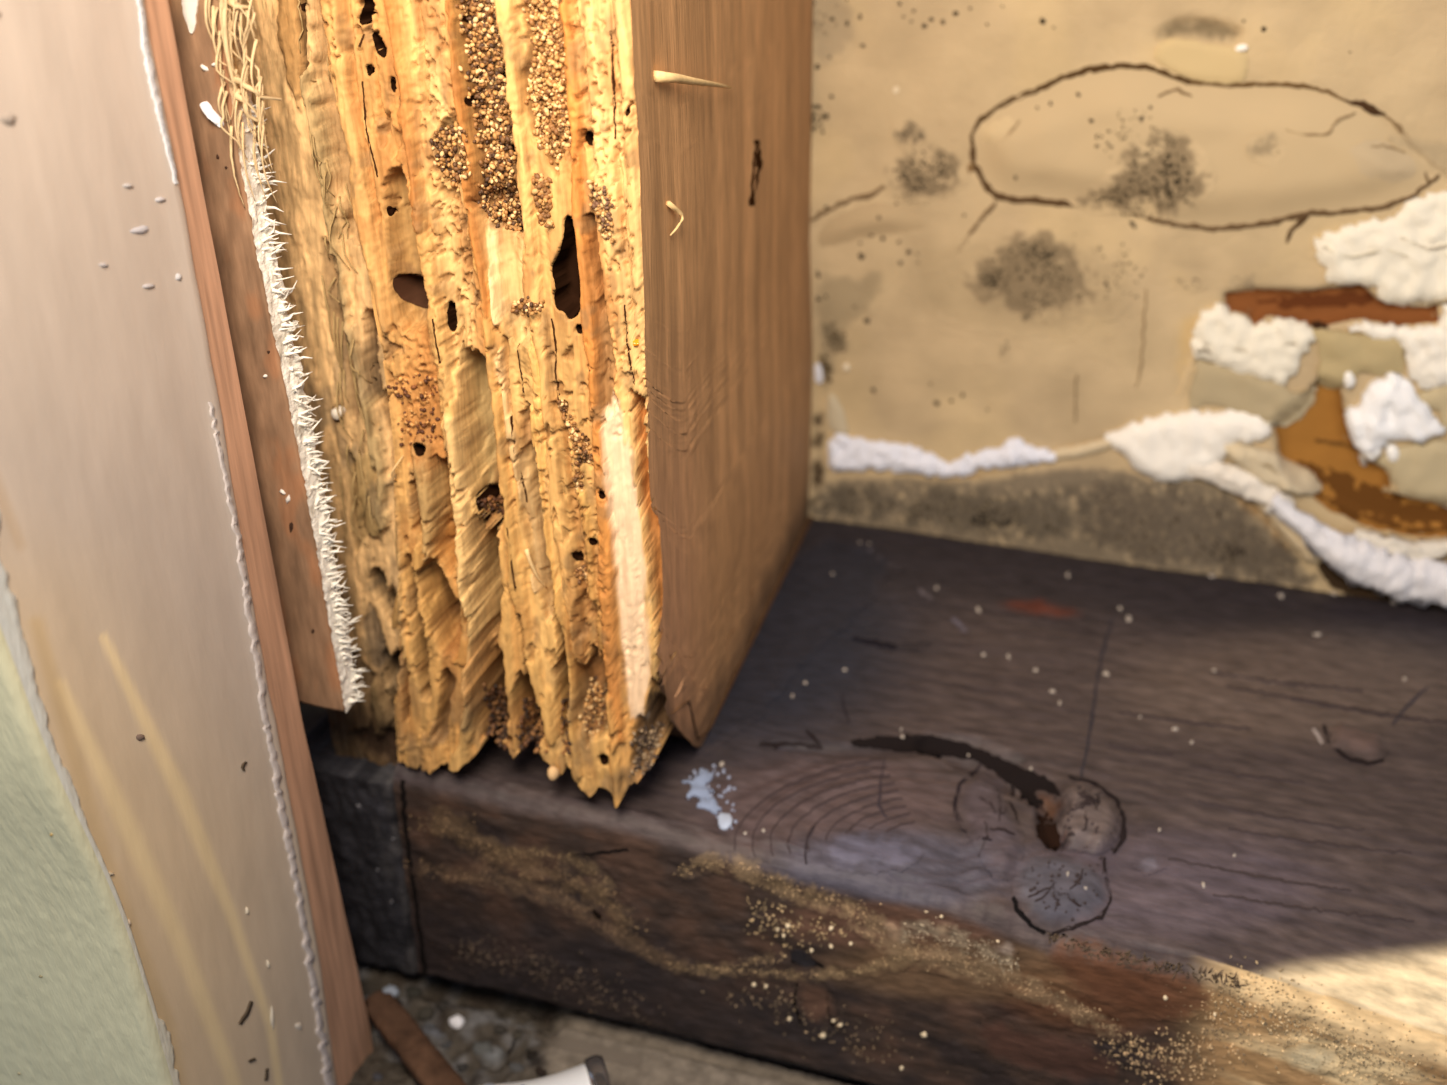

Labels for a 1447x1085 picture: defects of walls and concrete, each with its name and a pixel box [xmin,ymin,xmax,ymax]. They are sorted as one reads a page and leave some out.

leakage [877,112,969,205]
leakage [1067,106,1217,229]
crack [957,62,1447,258]
leakage [811,216,1146,399]
peeling [809,190,1447,609]
leakage [681,464,1328,830]